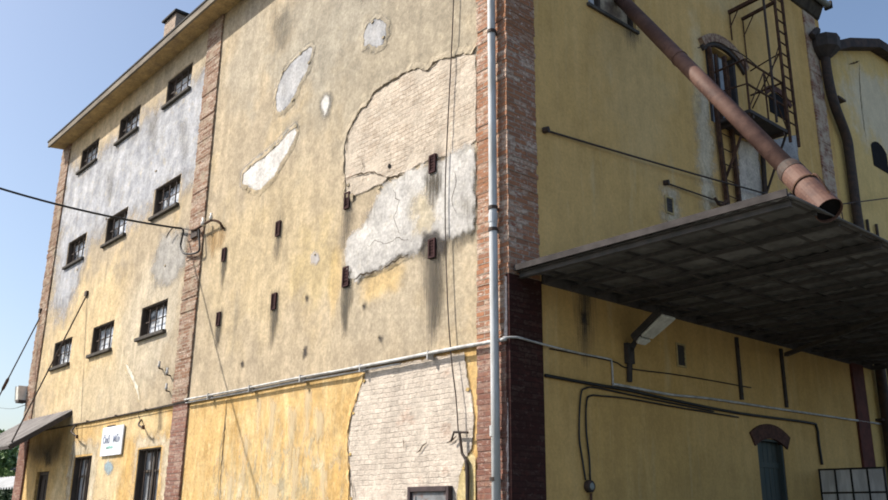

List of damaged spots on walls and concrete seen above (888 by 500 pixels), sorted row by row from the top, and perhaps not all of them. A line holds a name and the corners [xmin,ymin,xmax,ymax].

peeling [360,13,391,55]
peeling [240,122,300,196]
peeling [272,41,316,117]
peeling [320,93,331,118]
spalling [339,43,476,203]
crack [354,193,408,280]
leakage [341,283,350,326]
crack [218,400,227,498]
spalling [344,352,474,500]